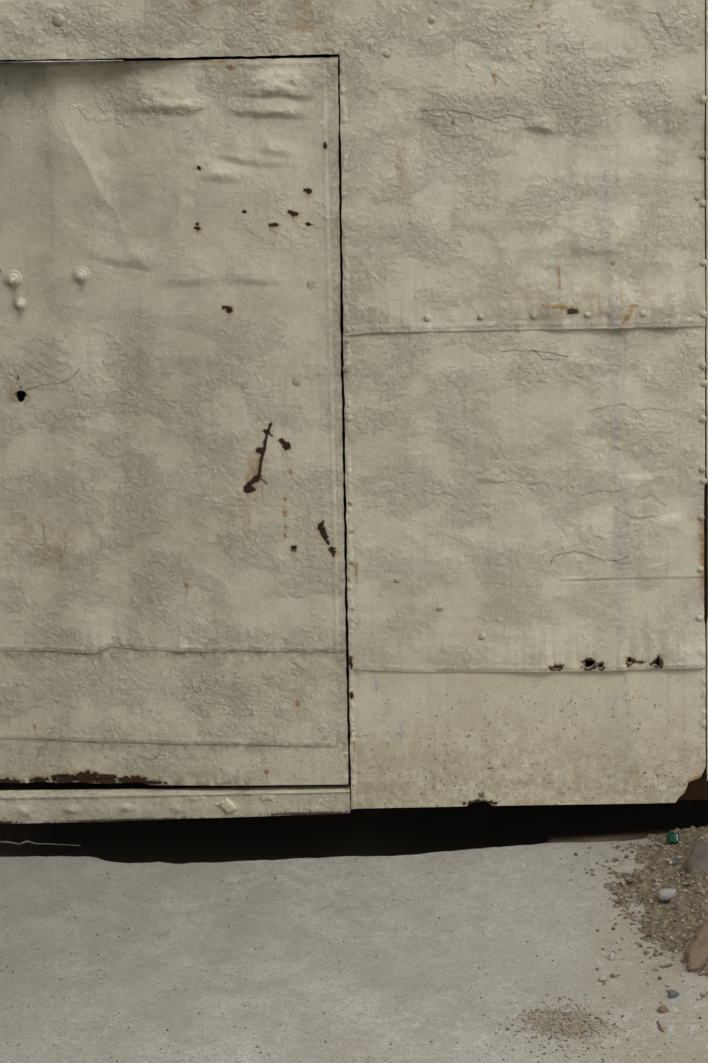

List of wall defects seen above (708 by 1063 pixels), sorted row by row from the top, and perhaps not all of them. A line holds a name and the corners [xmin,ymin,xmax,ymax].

rust [243,423,291,493]
rust [317,520,337,557]
rust [0,770,167,785]